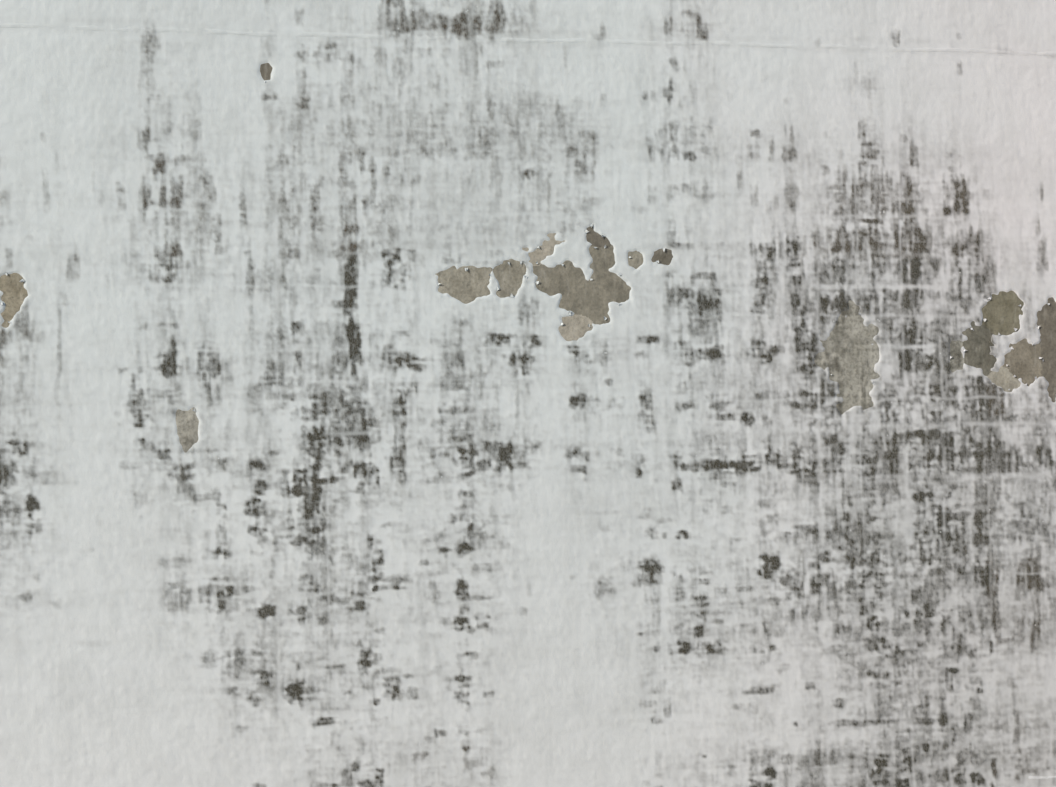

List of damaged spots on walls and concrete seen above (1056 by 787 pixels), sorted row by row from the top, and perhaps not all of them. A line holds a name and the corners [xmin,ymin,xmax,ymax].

peeling [260,63,273,81]
peeling [0,273,28,328]
mould [0,441,39,534]
peeling [176,407,199,453]
water stain [283,388,407,560]
water stain [336,225,361,375]
mould [432,435,525,476]
peeling [435,224,673,341]
peeling [814,300,880,414]
water stain [668,133,1053,685]
peeling [950,291,1056,402]
water stain [849,668,997,787]